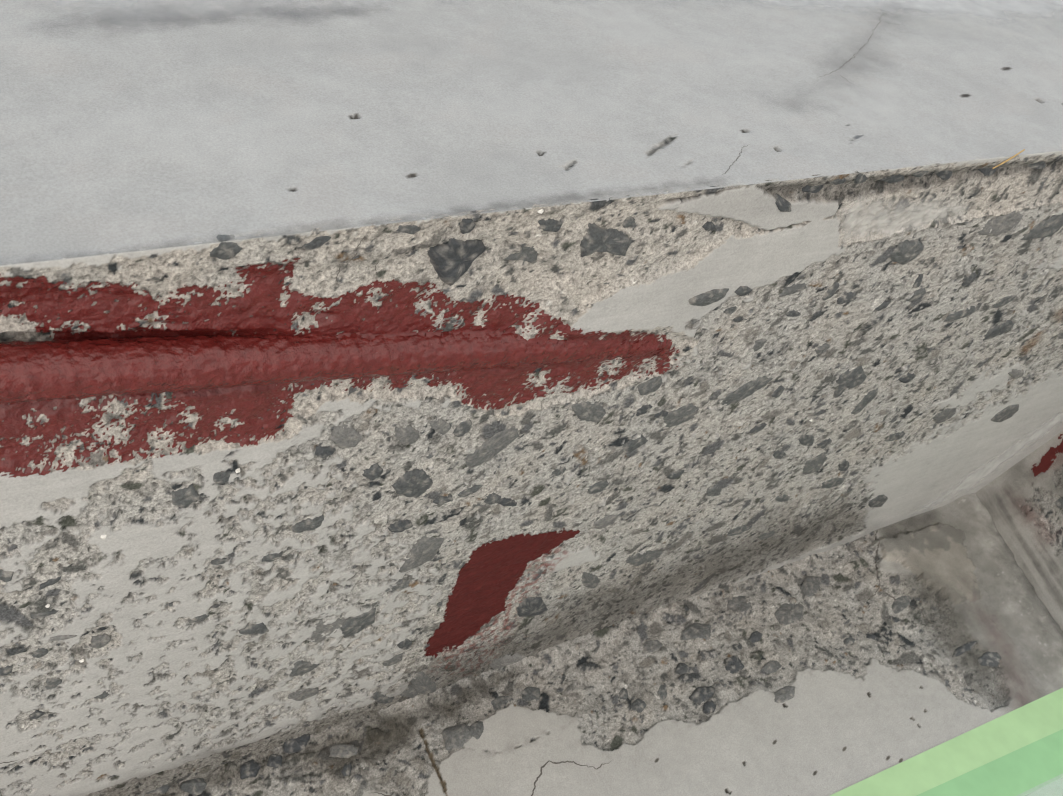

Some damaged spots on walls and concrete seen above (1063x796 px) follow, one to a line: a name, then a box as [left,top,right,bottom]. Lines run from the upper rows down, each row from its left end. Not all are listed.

spalling [22,408,49,430]
spalling [42,498,75,517]
spalling [78,155,1063,796]
spalling [0,519,118,739]
spalling [0,722,145,796]
crack [531,760,612,796]